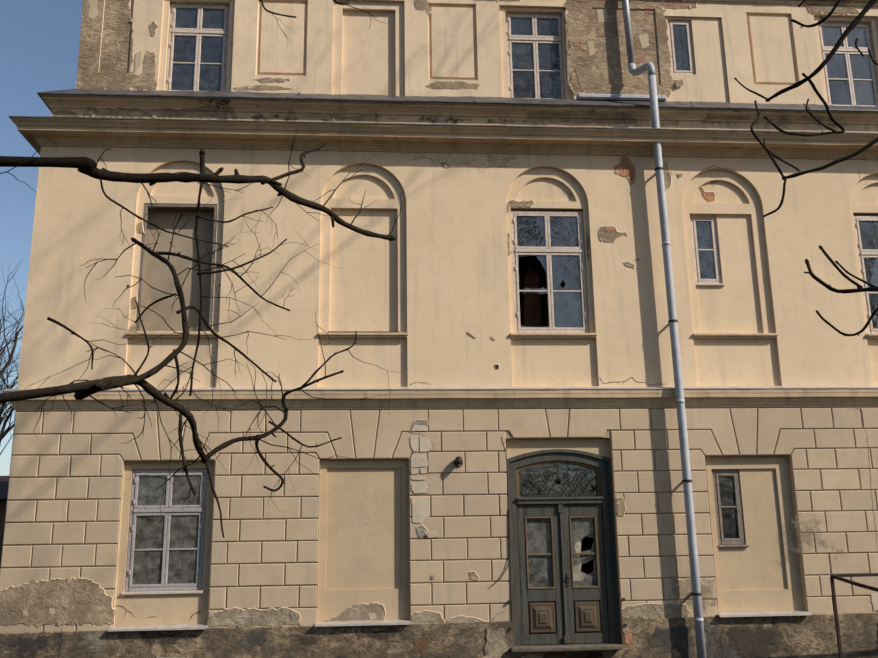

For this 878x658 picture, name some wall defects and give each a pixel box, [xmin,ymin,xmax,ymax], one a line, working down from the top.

flaking render [77,0,158,90]
flaking render [564,0,697,97]
peeling [427,81,479,89]
flaking render [612,156,637,187]
flaking render [585,226,628,261]
peeling [409,418,438,539]
flaking render [0,577,117,628]
water stain [141,632,195,647]
flaking render [207,607,301,628]
flaking render [325,602,386,621]
peeling [411,610,509,658]
water stain [651,626,695,658]